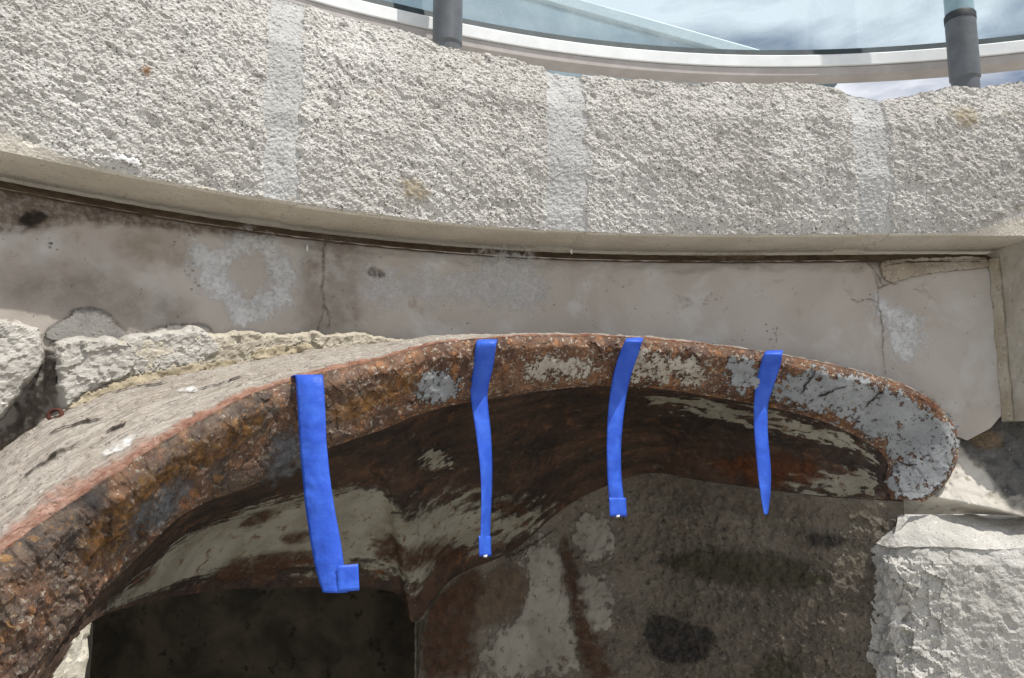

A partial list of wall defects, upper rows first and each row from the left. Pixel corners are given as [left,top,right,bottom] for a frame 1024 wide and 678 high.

water stain [186,234,298,327]
spalling [44,307,211,341]
peeling [520,338,626,388]
peeling [630,342,760,429]
peeling [768,363,960,500]
rust [0,426,185,550]
rust [721,458,816,485]
rust [243,511,272,526]
rust [218,532,315,582]
rust [371,534,459,572]
water stain [645,616,715,663]